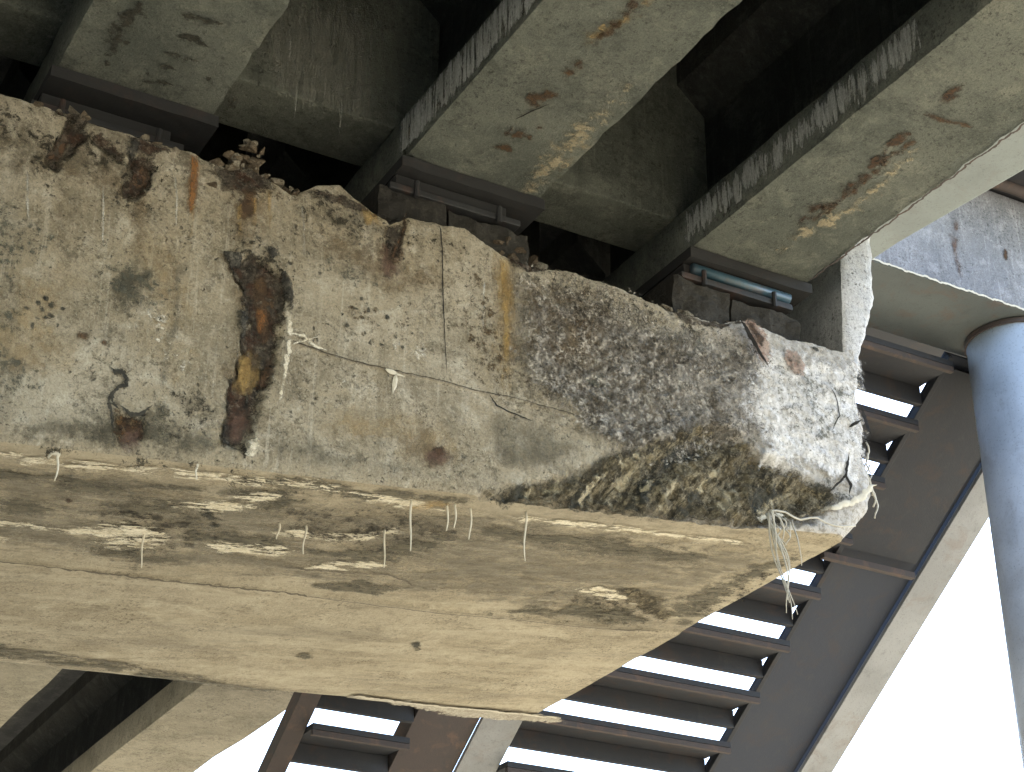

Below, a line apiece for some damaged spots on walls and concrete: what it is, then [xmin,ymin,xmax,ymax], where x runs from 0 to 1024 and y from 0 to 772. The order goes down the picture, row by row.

spalling [33,101,180,199]
rust [188,156,199,212]
leakage [219,186,299,281]
spalling [200,139,377,217]
rust [797,123,1024,281]
leakage [0,202,54,408]
crack [291,228,636,439]
rust [113,402,169,451]
leakage [0,384,799,632]
spalling [486,236,865,530]
crack [828,455,852,495]
crack [831,388,872,436]